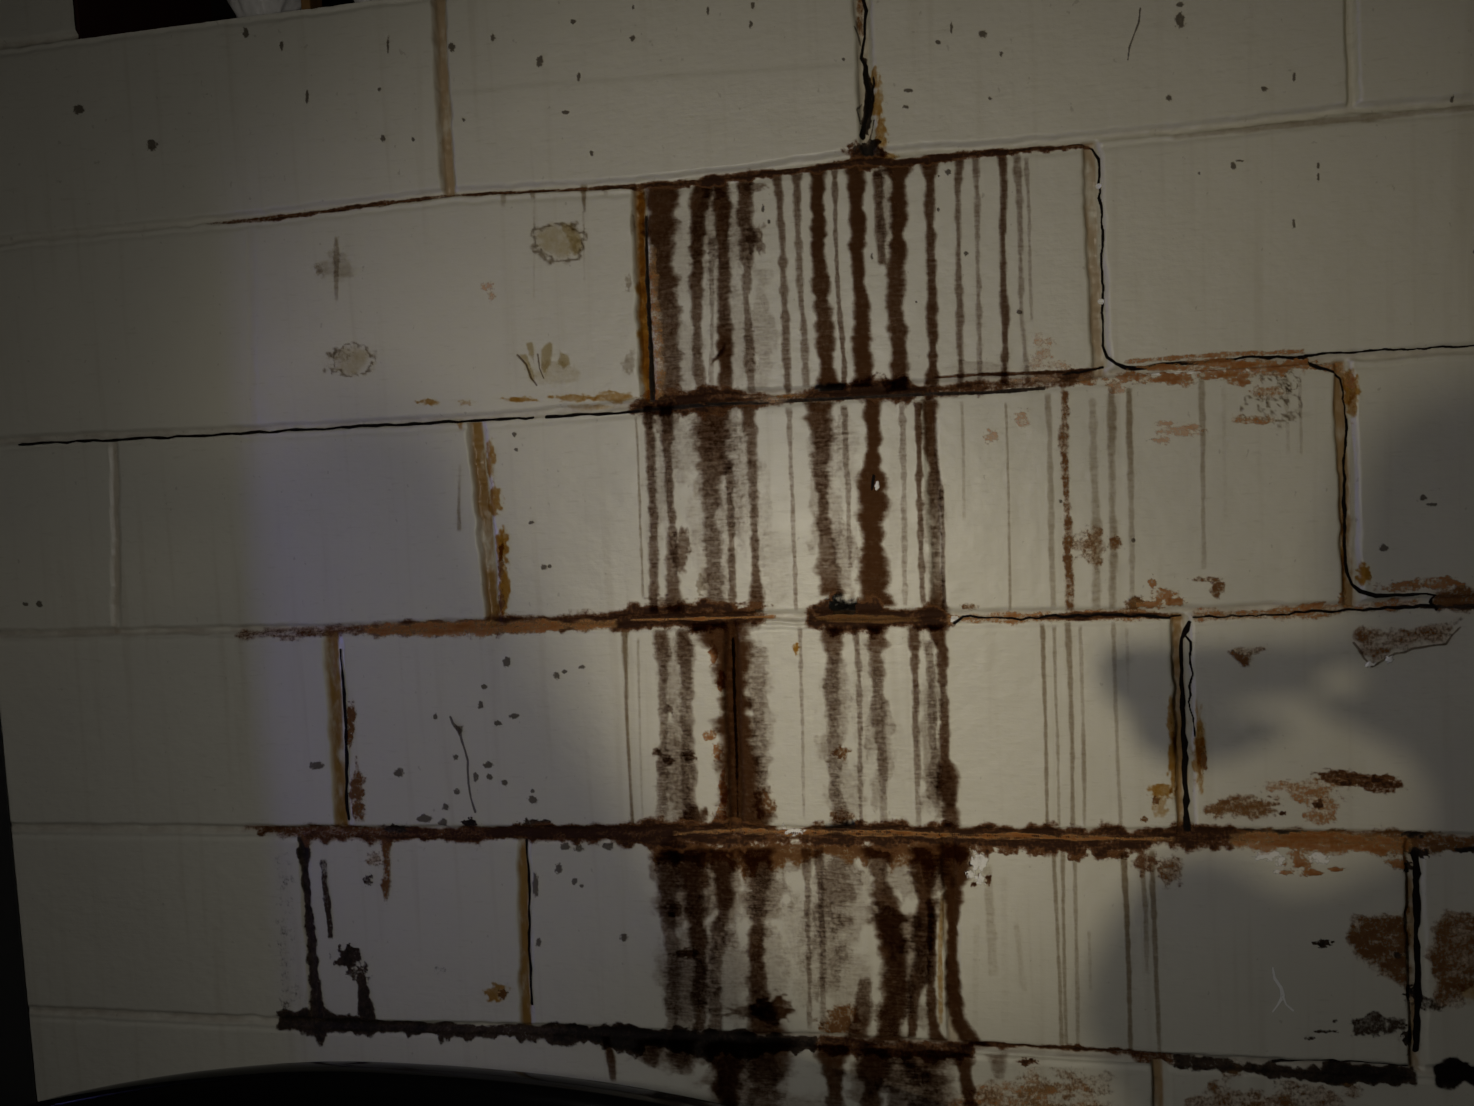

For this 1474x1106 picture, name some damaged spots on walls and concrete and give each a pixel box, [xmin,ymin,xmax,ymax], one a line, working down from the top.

crack [854,0,875,142]
corrosion [236,57,1474,1106]
crack [953,144,1474,832]